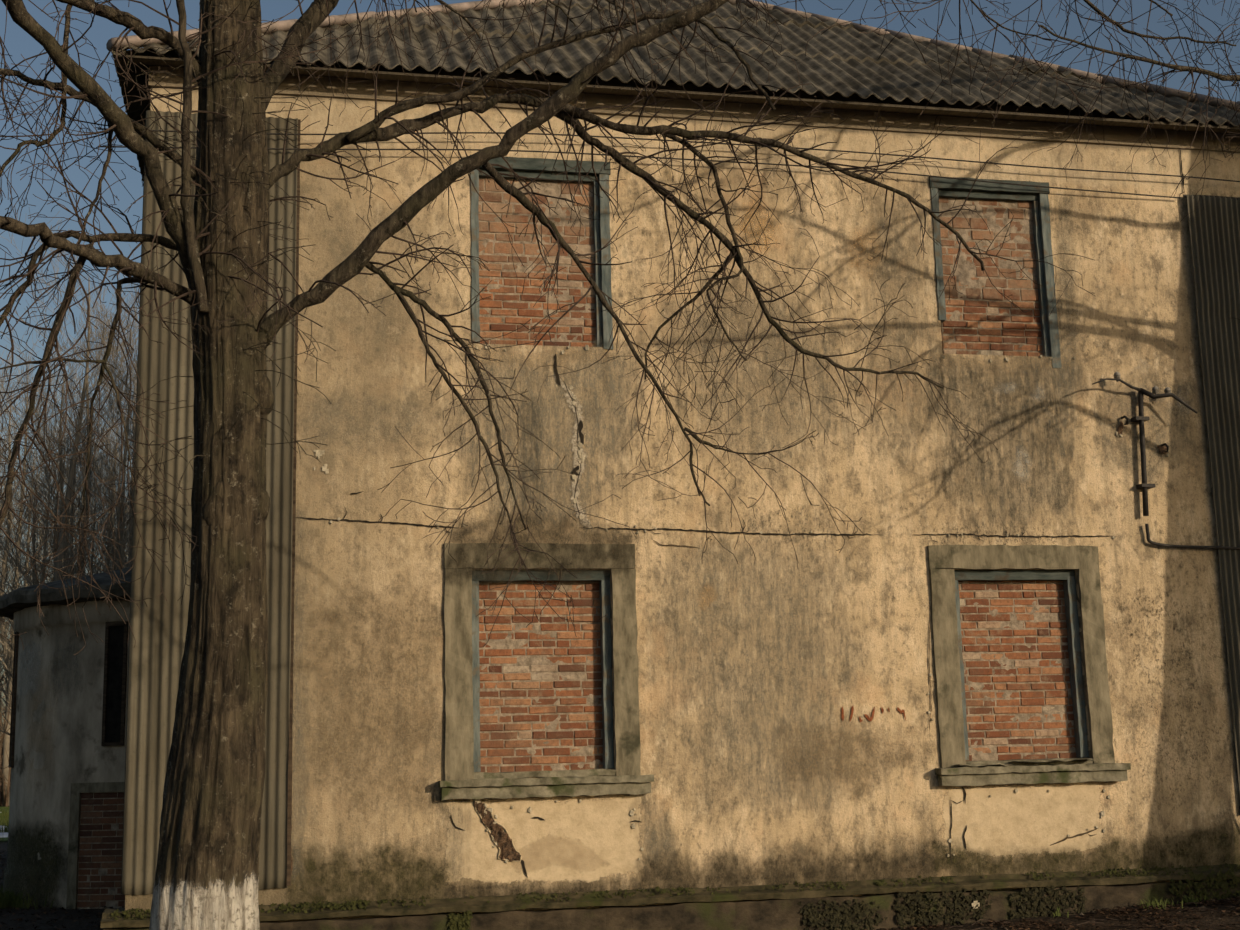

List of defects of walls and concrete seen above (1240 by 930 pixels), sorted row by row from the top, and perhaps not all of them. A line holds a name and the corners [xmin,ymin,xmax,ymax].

crack [553,354,561,386]
leakage [928,357,1074,545]
leakage [2,826,68,908]
crack [450,799,544,878]
leakage [289,589,1240,903]
leakage [665,548,911,802]